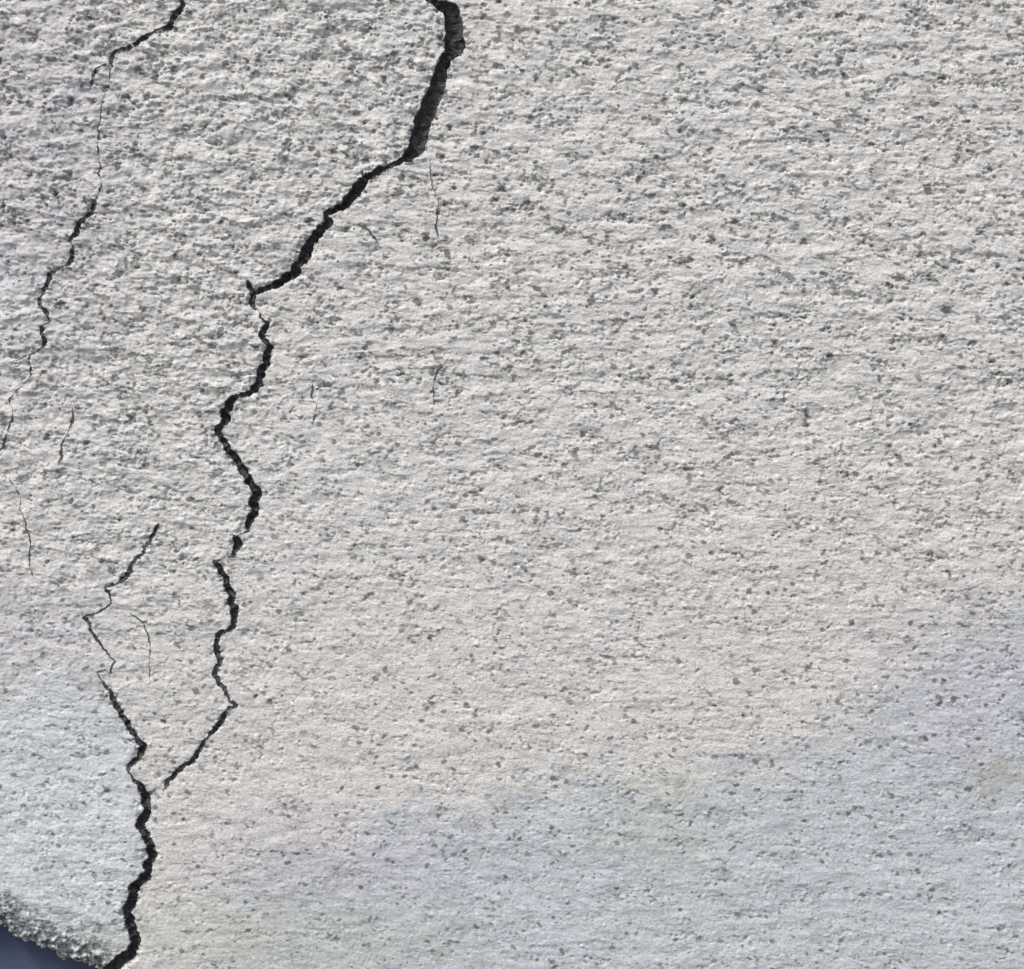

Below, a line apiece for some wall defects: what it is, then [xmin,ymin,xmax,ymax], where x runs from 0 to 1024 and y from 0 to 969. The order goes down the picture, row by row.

crack [0,0,185,450]
crack [82,0,465,969]